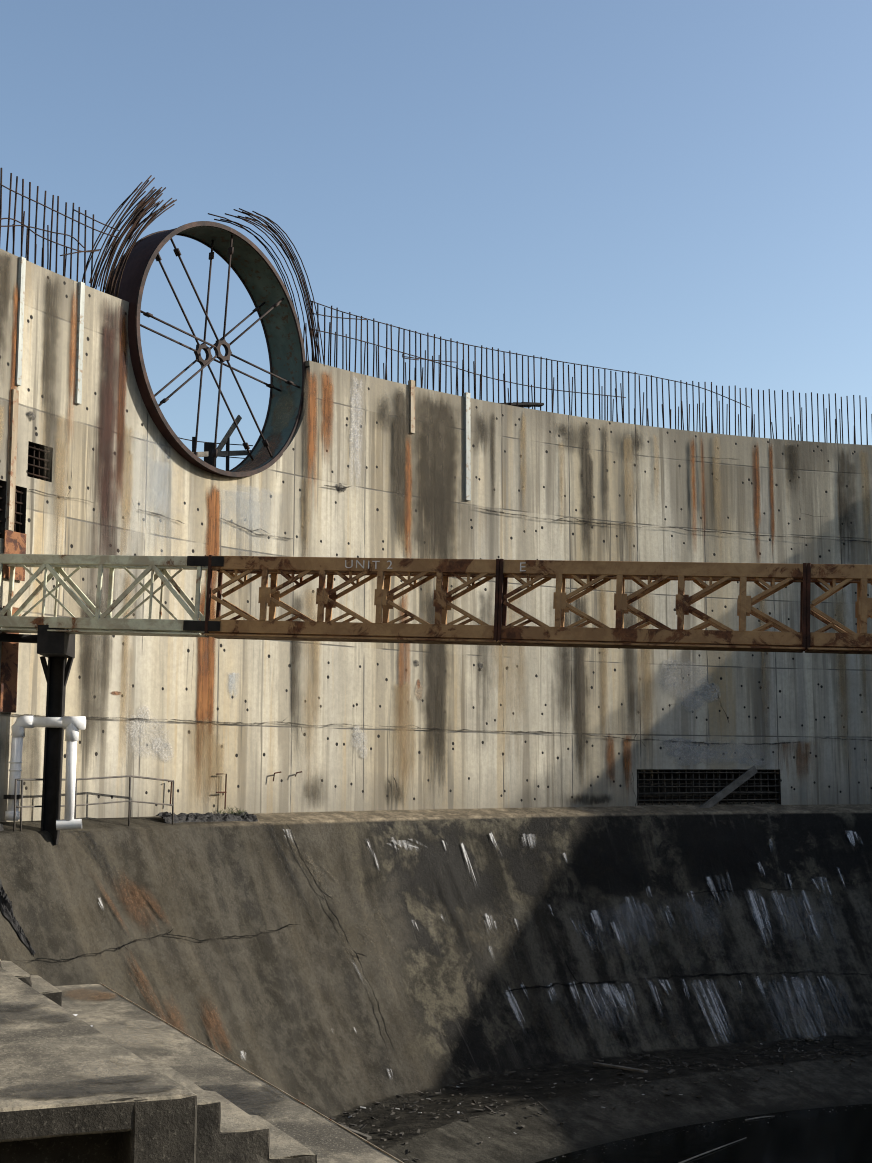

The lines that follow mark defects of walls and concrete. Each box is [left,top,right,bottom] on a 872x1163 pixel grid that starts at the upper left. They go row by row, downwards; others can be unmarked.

leakage [0,255,10,343]
corrosion [307,373,333,481]
corrosion [206,488,220,556]
leakage [570,424,608,561]
corrosion [754,447,775,557]
corrosion [200,571,217,619]
corrosion [197,634,215,775]
leakage [427,644,448,761]
leakage [563,647,589,768]
crack [33,924,299,961]
crack [504,964,625,992]
crack [663,968,812,979]